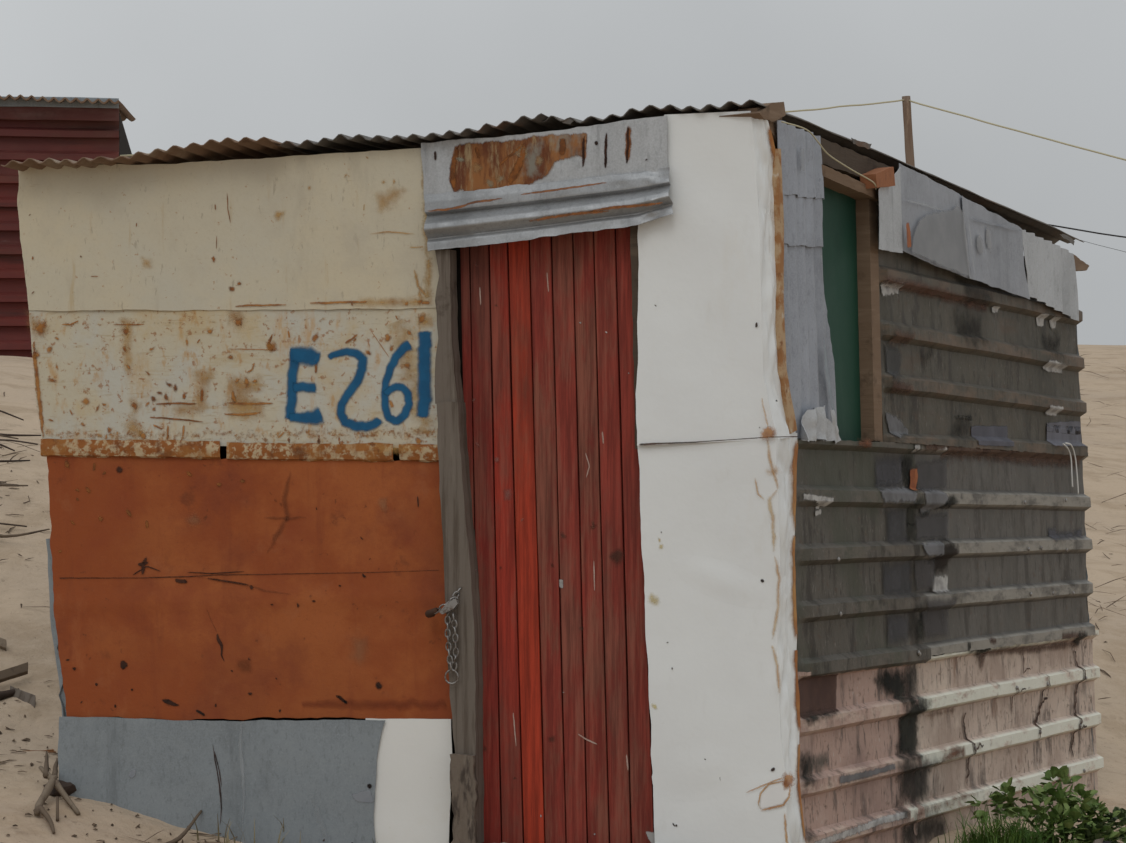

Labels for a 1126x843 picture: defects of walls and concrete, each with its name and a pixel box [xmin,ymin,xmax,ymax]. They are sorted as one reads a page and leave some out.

corrosion [424,133,605,235]
corrosion [32,321,78,436]
corrosion [68,376,239,439]
corrosion [225,334,277,416]
corrosion [233,304,283,325]
corrosion [254,429,344,451]
corrosion [310,231,430,324]
corrosion [366,331,411,378]
leakage [877,668,938,814]
crack [963,713,984,782]
crack [1011,649,1087,756]